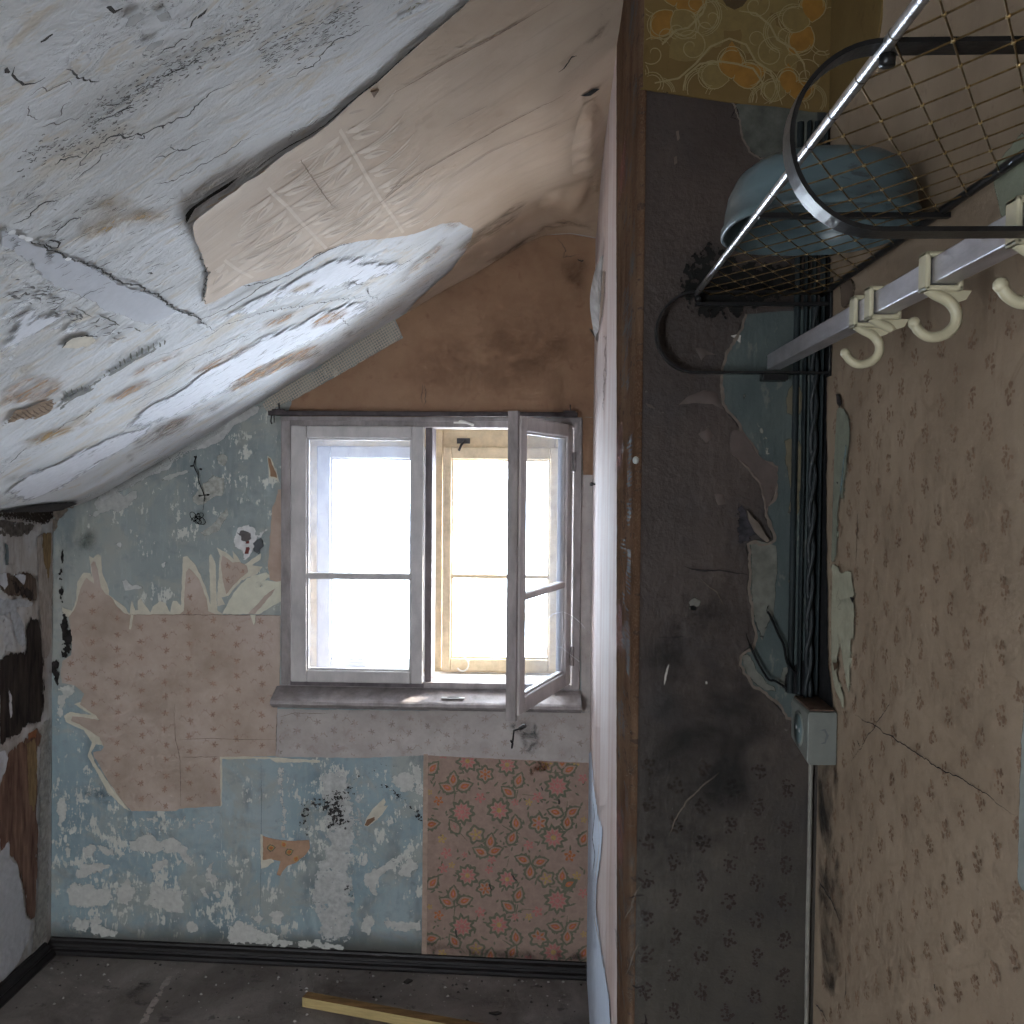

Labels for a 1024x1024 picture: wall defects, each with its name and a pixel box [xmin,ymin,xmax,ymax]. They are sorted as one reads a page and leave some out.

crack [159,36,202,77]
spalling [17,1,362,177]
crack [287,21,368,79]
peeling [2,279,141,360]
crack [2,67,434,472]
peeling [228,256,400,319]
spalling [735,504,769,544]
peeling [0,302,368,982]
peeling [391,764,423,795]
crack [852,686,1010,813]
peeling [227,769,421,950]